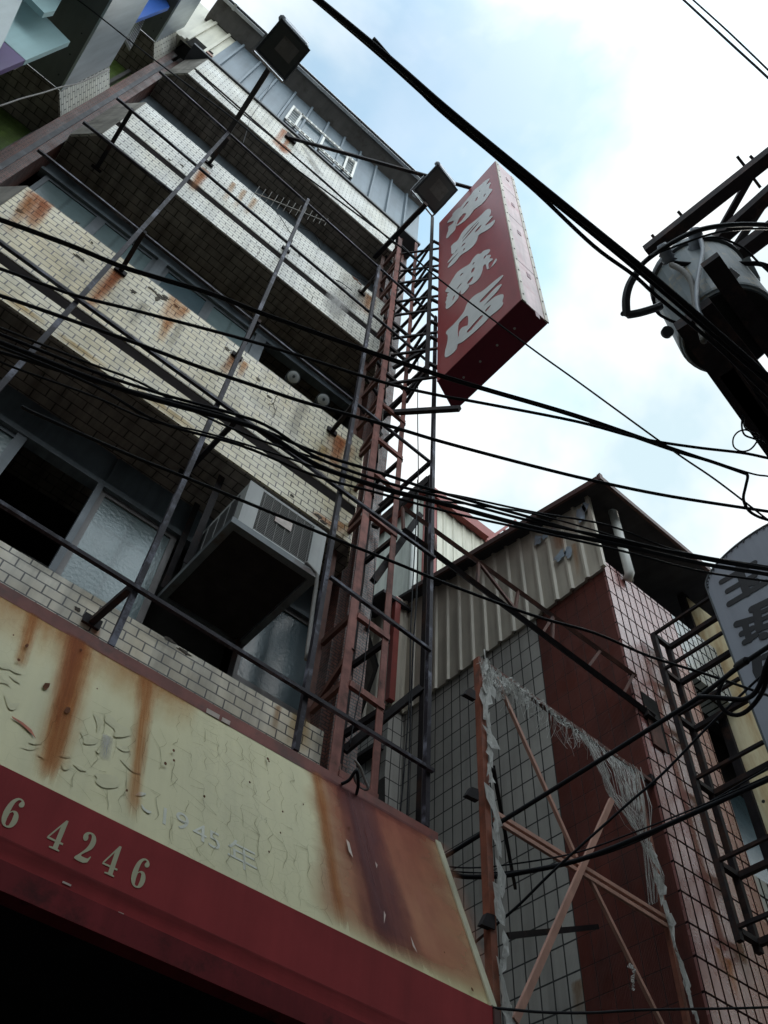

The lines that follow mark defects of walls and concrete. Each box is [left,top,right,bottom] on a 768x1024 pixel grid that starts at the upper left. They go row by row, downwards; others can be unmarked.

corrosion [45,639,92,767]
corrosion [131,677,152,803]
crack [42,692,333,925]
corrosion [315,773,481,979]